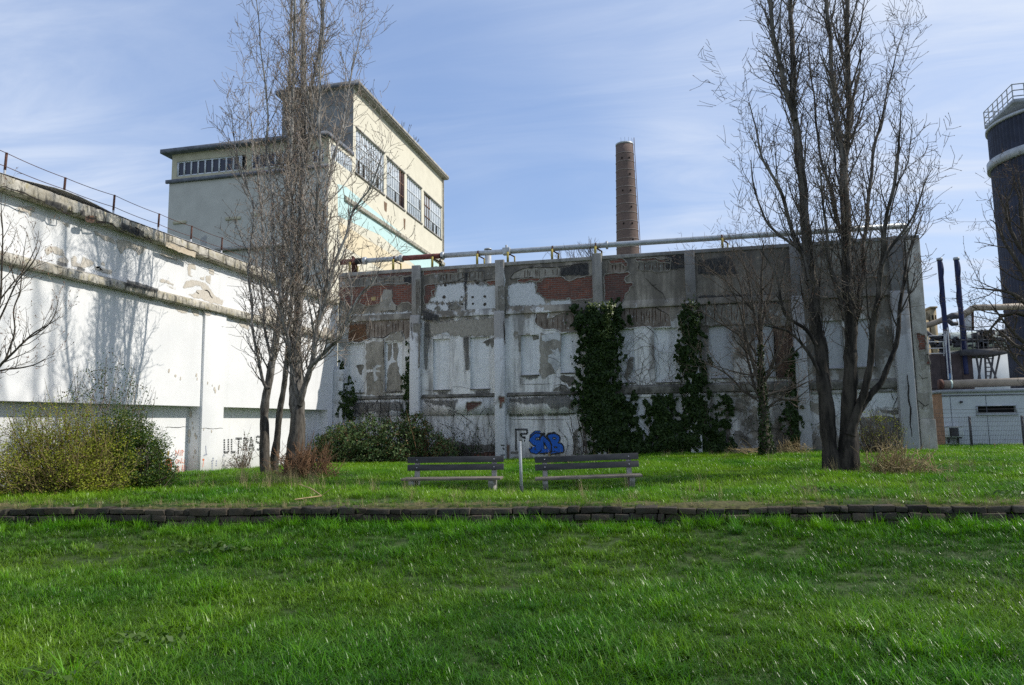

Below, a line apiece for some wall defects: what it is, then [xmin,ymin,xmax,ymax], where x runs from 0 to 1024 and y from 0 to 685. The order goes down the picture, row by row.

peeling [132,254,250,329]
flaking render [324,257,672,400]
crack [891,374,929,436]